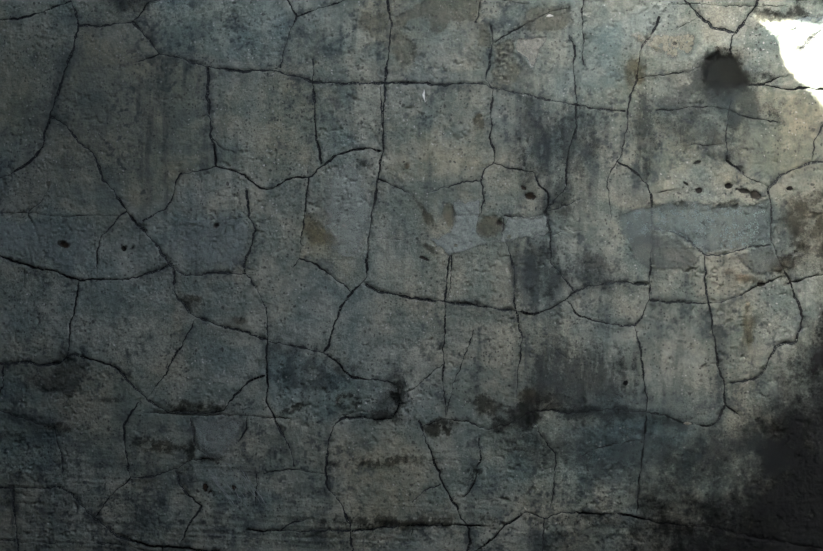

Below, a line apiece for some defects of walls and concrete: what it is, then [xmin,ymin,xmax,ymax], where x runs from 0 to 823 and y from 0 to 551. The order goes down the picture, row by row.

crack [579,0,587,65]
crack [675,0,788,55]
damp [701,48,775,97]
crack [0,0,454,477]
crack [365,13,823,512]
damp [773,191,823,278]
damp [470,387,565,432]
crack [0,402,219,551]
crack [250,411,399,551]
crack [409,420,596,551]
crack [615,513,654,522]